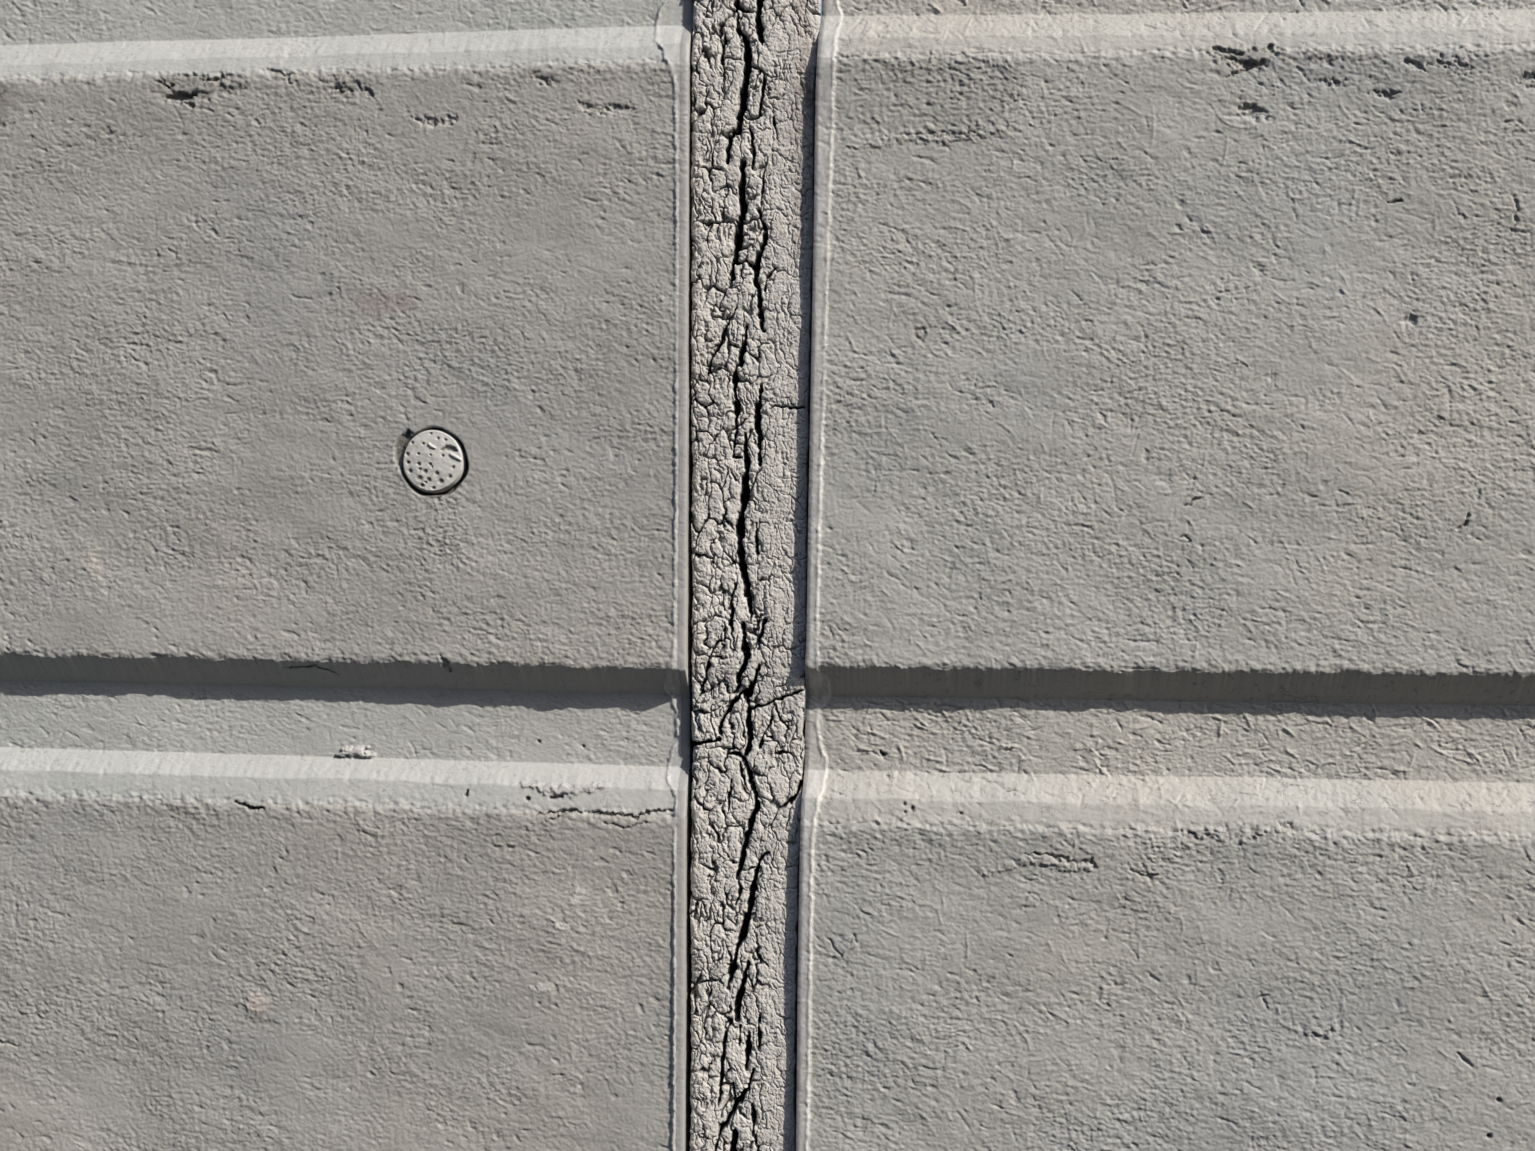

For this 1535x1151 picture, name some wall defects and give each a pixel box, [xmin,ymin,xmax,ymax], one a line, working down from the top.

crack [690,0,804,1151]